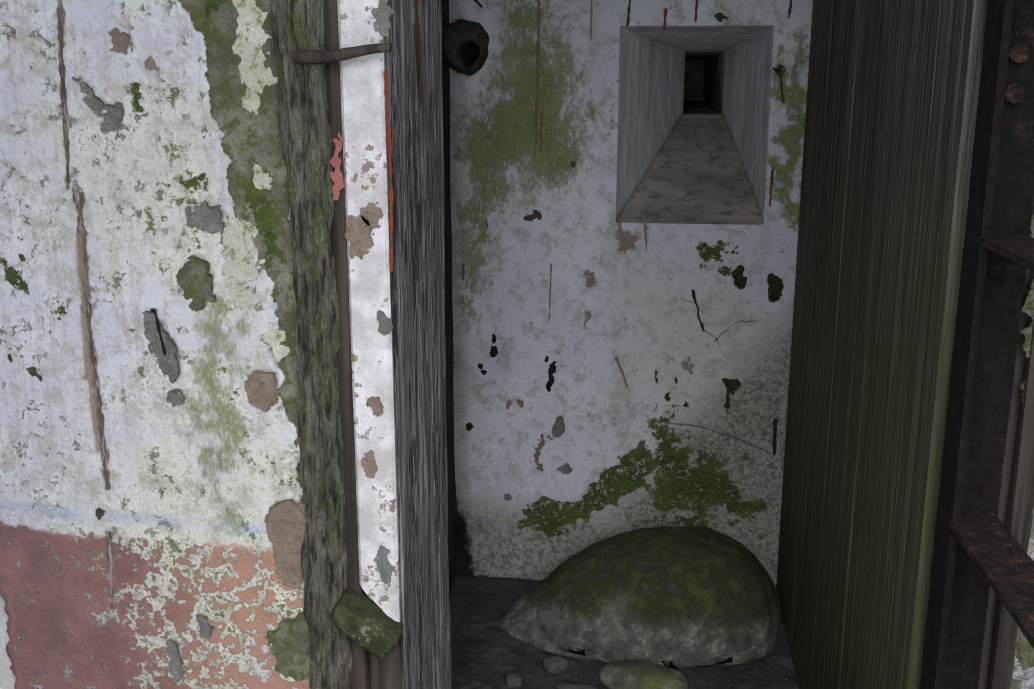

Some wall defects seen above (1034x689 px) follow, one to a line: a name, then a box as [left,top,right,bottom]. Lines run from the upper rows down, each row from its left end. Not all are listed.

flaking render [109,28,133,54]
flaking render [144,56,159,71]
flaking render [72,77,124,132]
flaking render [176,0,299,447]
flaking render [142,308,186,407]
peeling [264,463,306,590]
flaking render [166,639,184,684]
flaking render [195,614,215,639]
peeling [265,612,311,681]